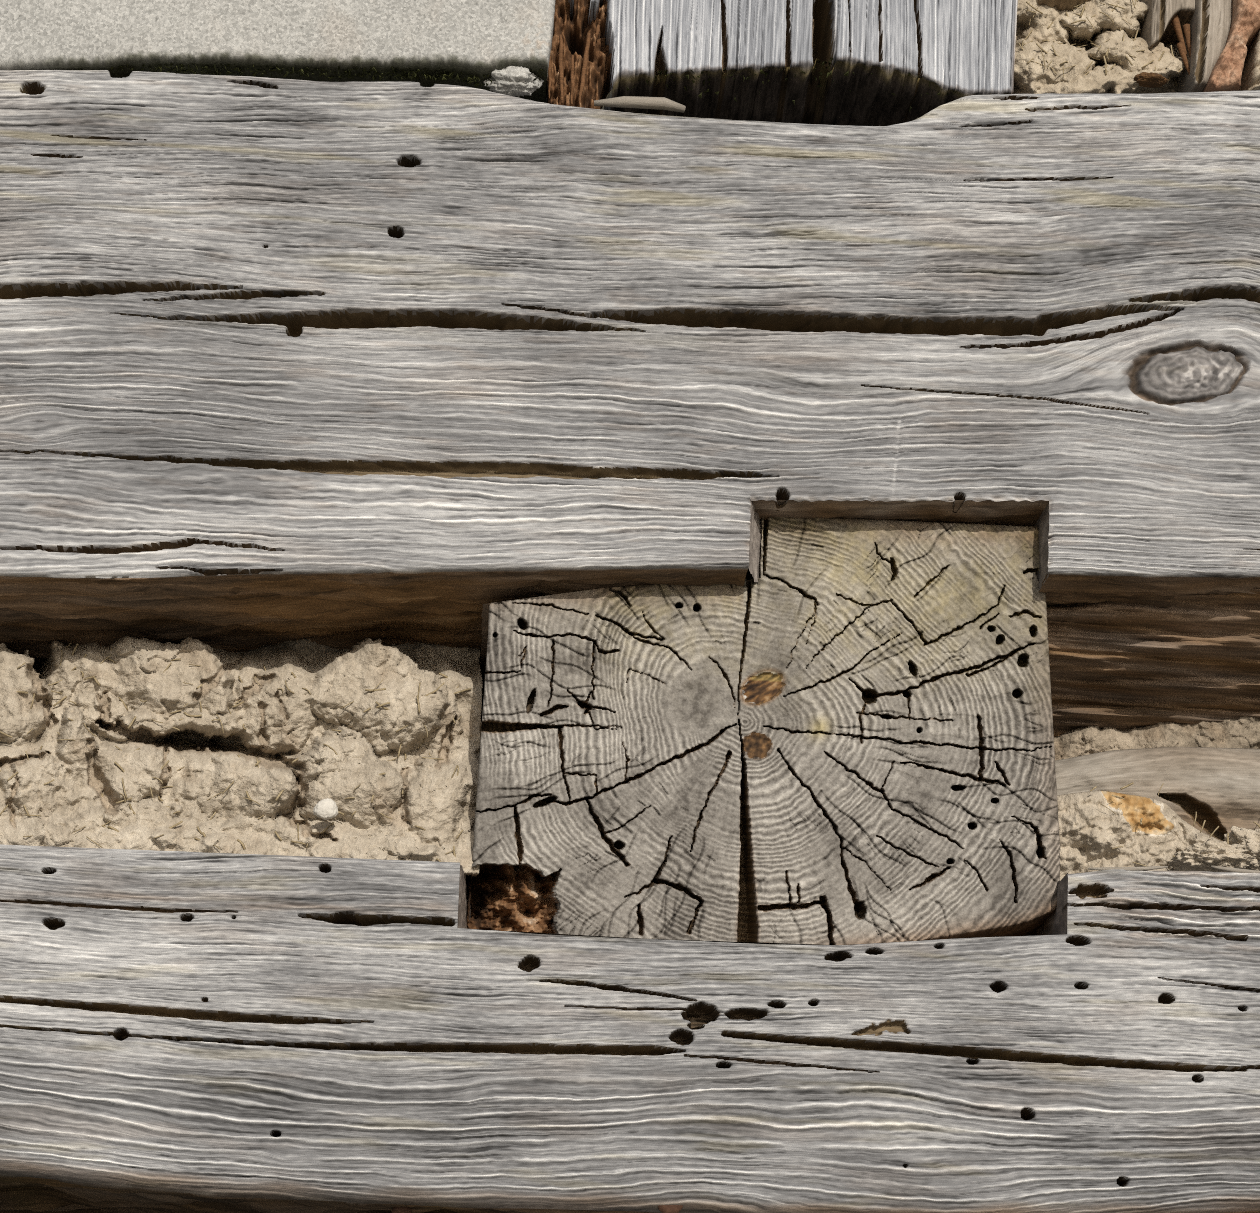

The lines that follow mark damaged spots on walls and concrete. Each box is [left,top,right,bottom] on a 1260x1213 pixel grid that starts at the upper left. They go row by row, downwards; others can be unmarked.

crack [715,0,728,119]
crack [775,0,883,124]
crack [904,0,923,123]
crack [0,281,1260,349]
crack [14,449,770,480]
crack [399,518,1046,945]
crack [540,978,697,1012]
crack [0,995,1260,1072]